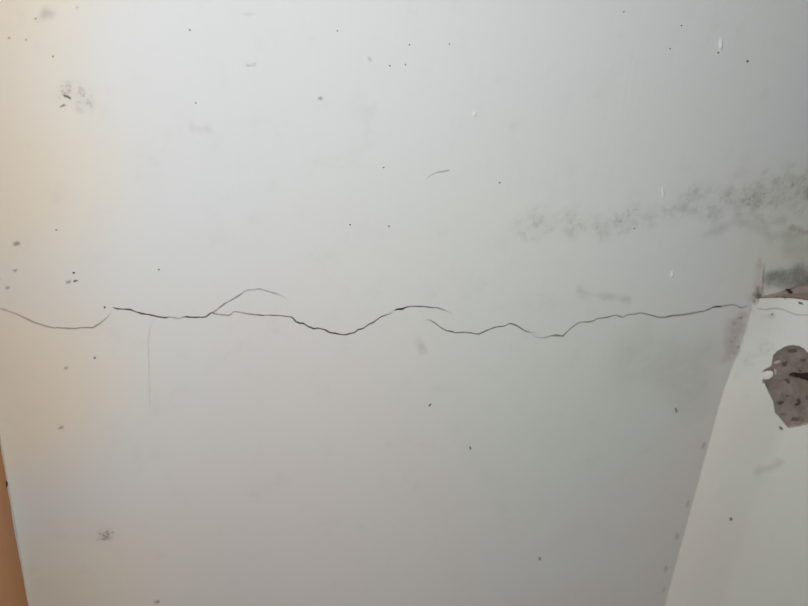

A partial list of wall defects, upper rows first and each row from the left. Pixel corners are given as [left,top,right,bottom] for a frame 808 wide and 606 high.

crack [115,296,525,335]
spalling [762,345,808,428]